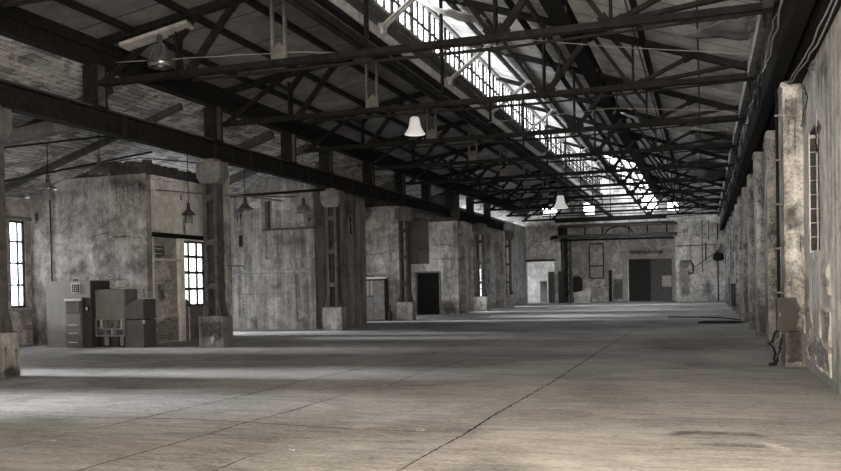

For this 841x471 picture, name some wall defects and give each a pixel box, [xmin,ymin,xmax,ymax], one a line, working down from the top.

flaking render [786,283,832,379]